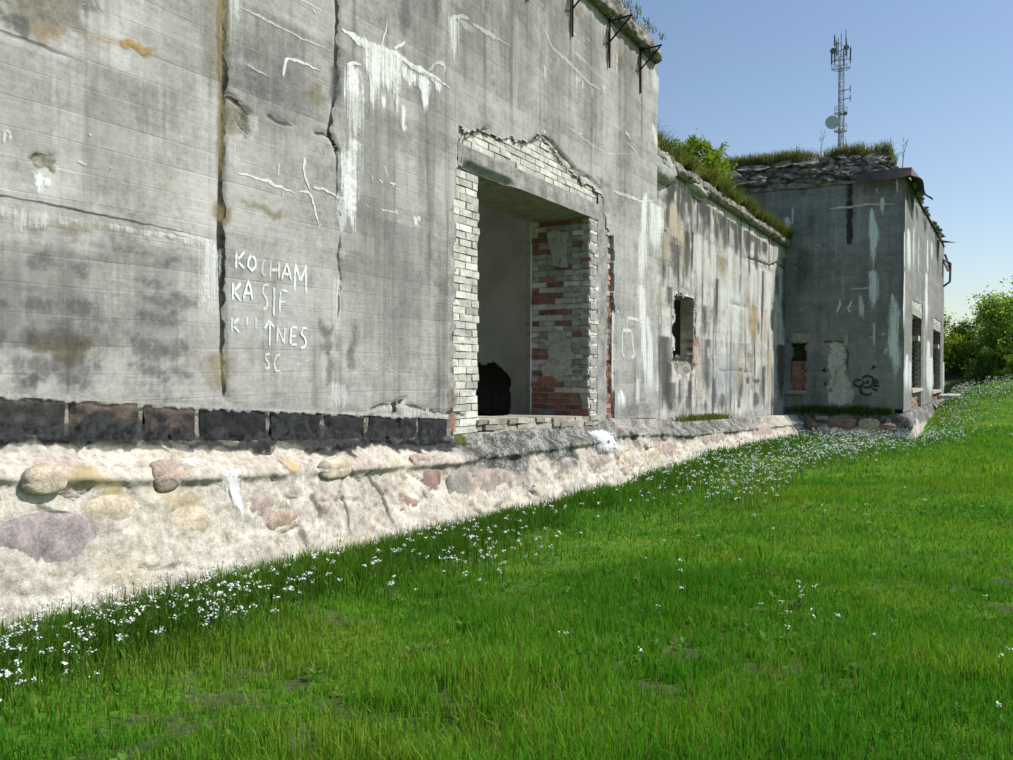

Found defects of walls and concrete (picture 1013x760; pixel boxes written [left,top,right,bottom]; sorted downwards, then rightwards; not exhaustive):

flaking render [0,0,85,43]
rust [121,39,152,55]
damp [337,14,475,230]
crack [0,0,342,395]
damp [611,181,785,409]
flaking render [822,331,854,406]
crack [830,178,886,244]
damp [858,197,886,316]
damp [888,230,911,389]
damp [896,182,938,328]
efflorescence [926,341,944,395]